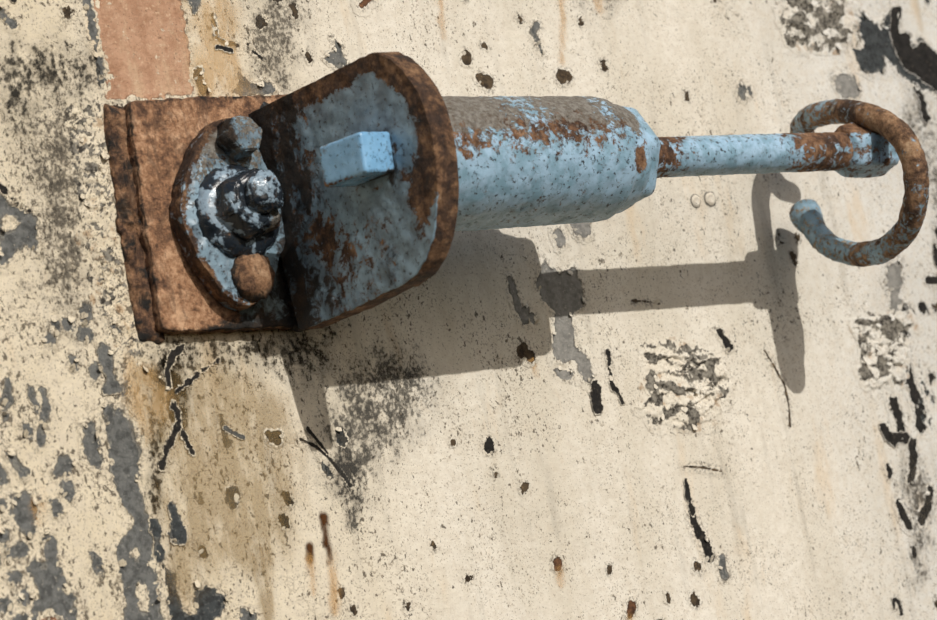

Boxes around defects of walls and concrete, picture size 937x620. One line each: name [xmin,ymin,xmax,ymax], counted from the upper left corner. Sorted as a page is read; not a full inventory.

peeling [252,0,301,38]
peeling [226,68,286,97]
peeling [829,0,937,123]
peeling [0,0,263,620]
peeling [500,222,604,415]
peeling [879,222,937,563]
peeling [262,424,287,449]
peeling [274,486,298,533]
rust [306,513,332,563]